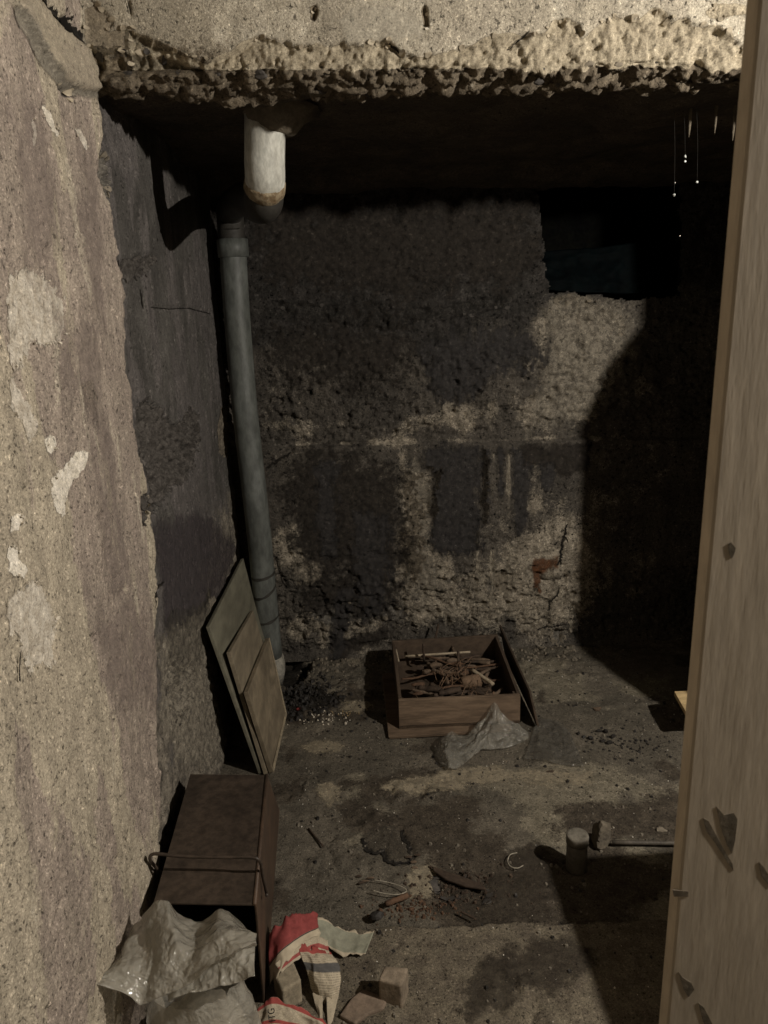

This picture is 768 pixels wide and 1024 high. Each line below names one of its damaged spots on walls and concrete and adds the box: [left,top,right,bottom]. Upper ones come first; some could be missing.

spalling [83,0,746,95]
peeling [51,450,88,517]
water stain [276,295,640,660]
corrosion [532,557,558,593]
crack [538,524,569,630]